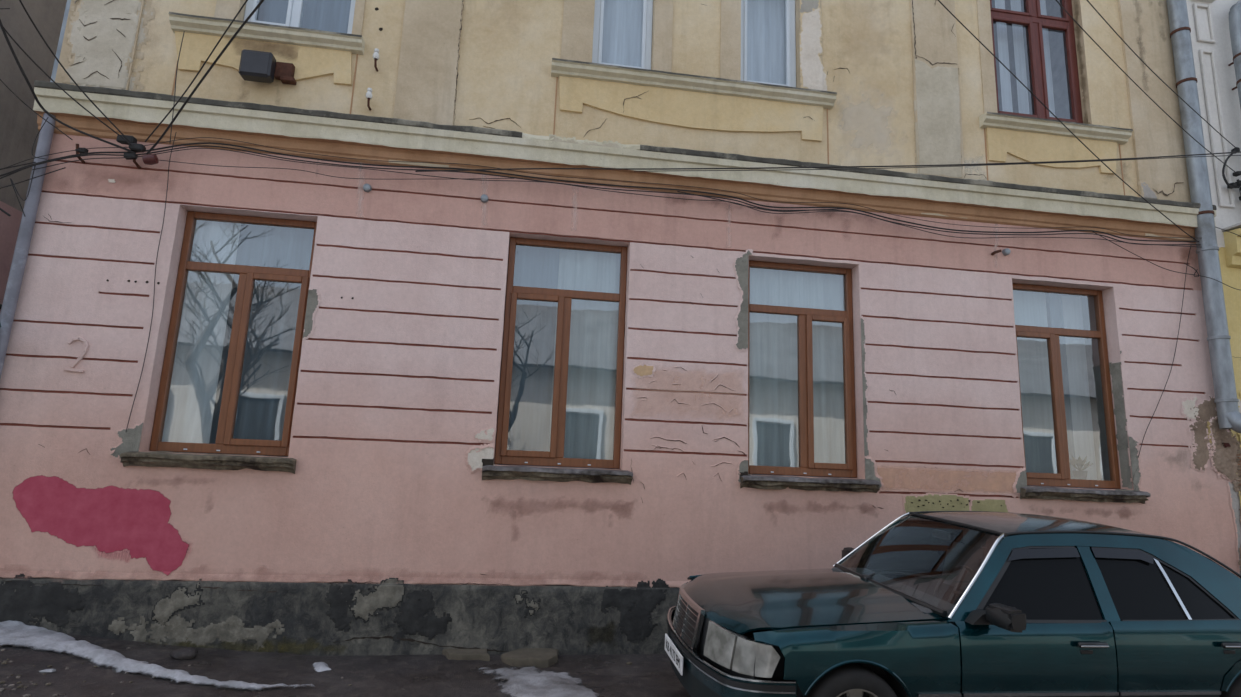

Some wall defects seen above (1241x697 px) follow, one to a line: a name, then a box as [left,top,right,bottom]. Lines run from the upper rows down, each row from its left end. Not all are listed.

peeling [59,0,156,92]
peeling [799,6,829,91]
flaking render [1181,395,1241,522]
peeling [0,574,103,628]
peeling [108,579,285,652]
peeling [324,578,452,643]